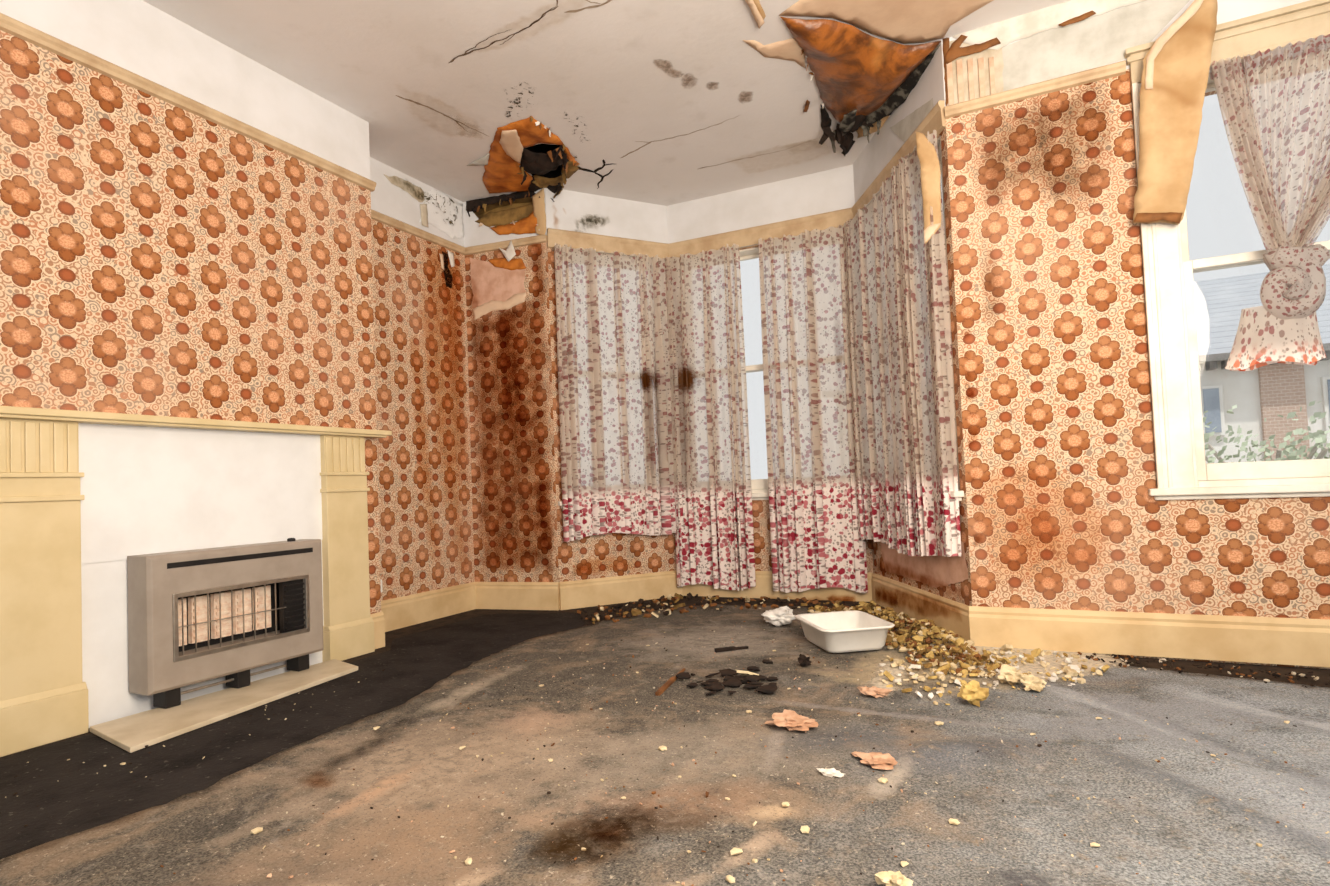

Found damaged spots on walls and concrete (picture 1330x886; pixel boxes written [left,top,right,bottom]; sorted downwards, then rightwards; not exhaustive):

crack [449,0,611,63]
crack [396,95,487,136]
spalling [384,116,579,309]
peeling [890,98,941,244]
peeling [1132,0,1218,225]